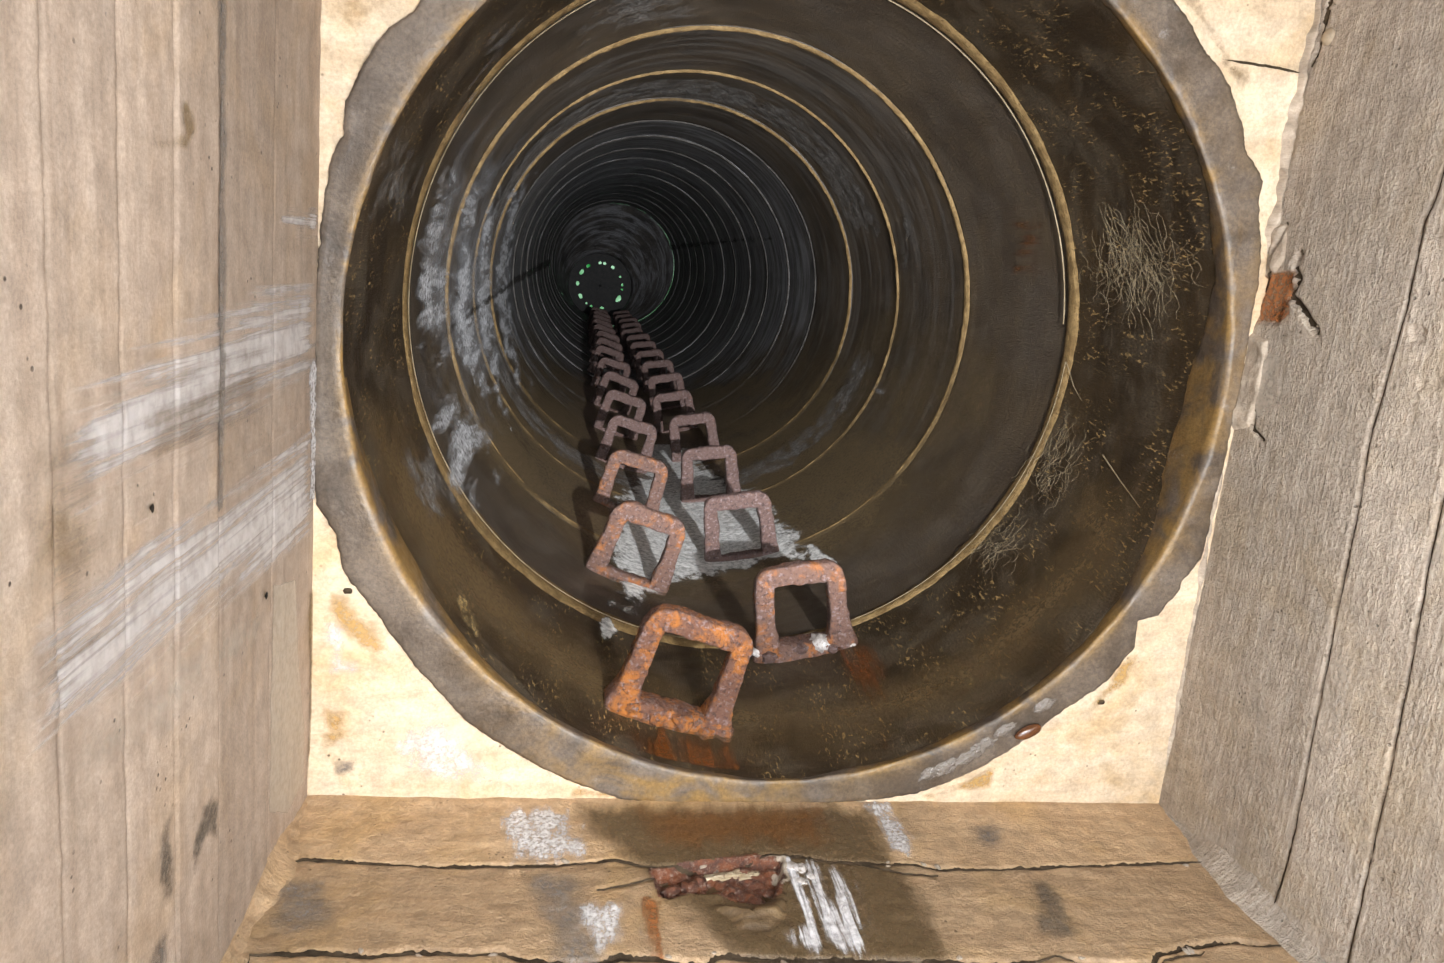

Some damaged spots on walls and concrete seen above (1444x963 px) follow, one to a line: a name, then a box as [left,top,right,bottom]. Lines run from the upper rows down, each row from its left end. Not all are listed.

rust [1260,272,1295,323]
water stain [52,0,317,717]
crack [1274,171,1444,963]
water stain [194,803,217,856]
water stain [161,842,172,887]
crack [296,854,1201,891]
water stain [580,790,944,963]
crack [248,948,1085,963]
crack [1151,941,1281,963]